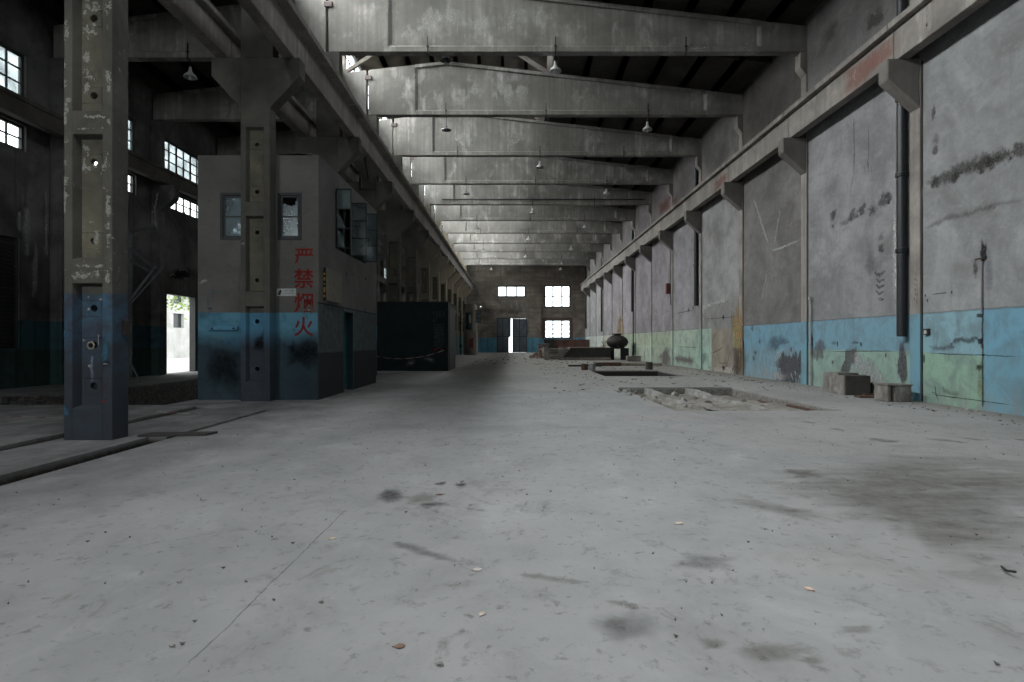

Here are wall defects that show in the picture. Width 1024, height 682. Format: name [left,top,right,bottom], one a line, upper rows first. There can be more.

peeling [82,0,112,96]
peeling [64,60,111,130]
peeling [82,144,110,173]
water stain [931,143,1024,187]
peeling [82,190,111,248]
peeling [65,264,110,310]